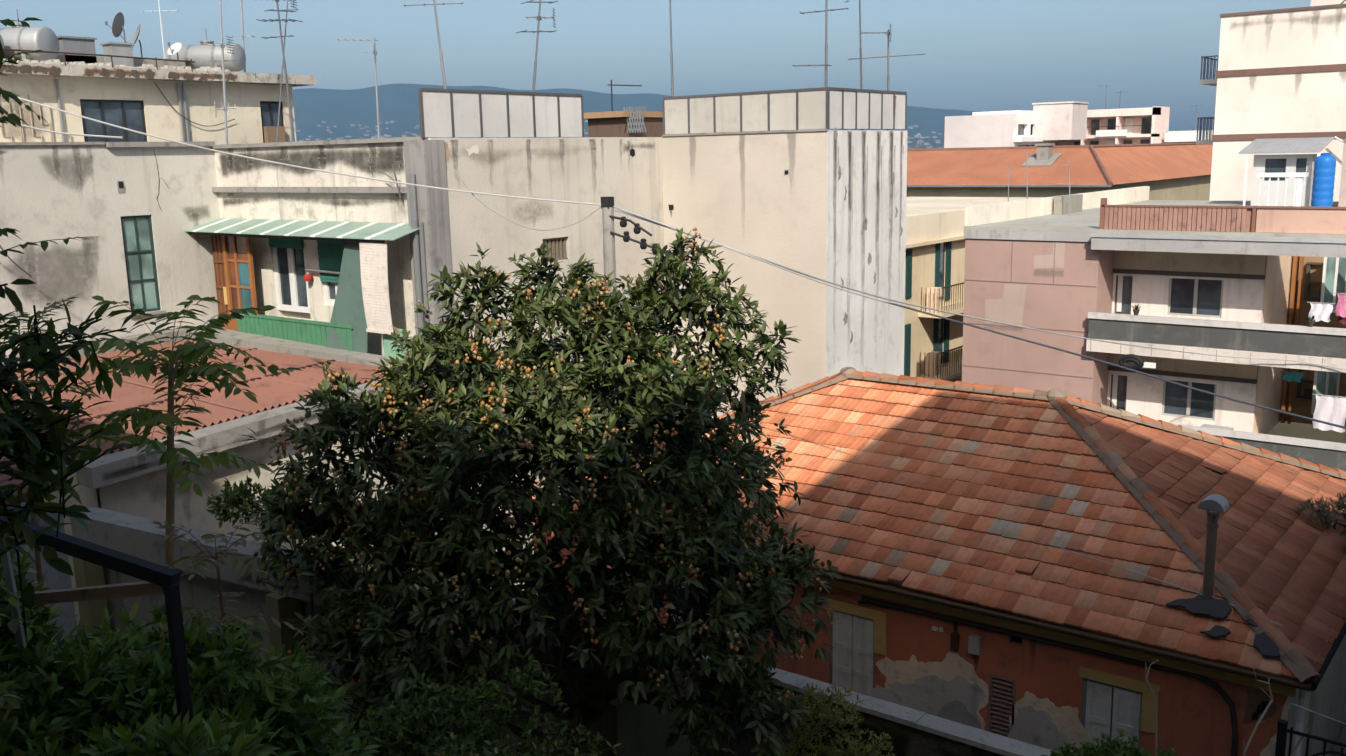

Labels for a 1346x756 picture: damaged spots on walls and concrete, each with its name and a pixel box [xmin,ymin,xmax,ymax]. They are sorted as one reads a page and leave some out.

water stain [44,146,90,185]
water stain [15,236,93,300]
peeling [871,651,990,730]
peeling [1008,691,1091,752]